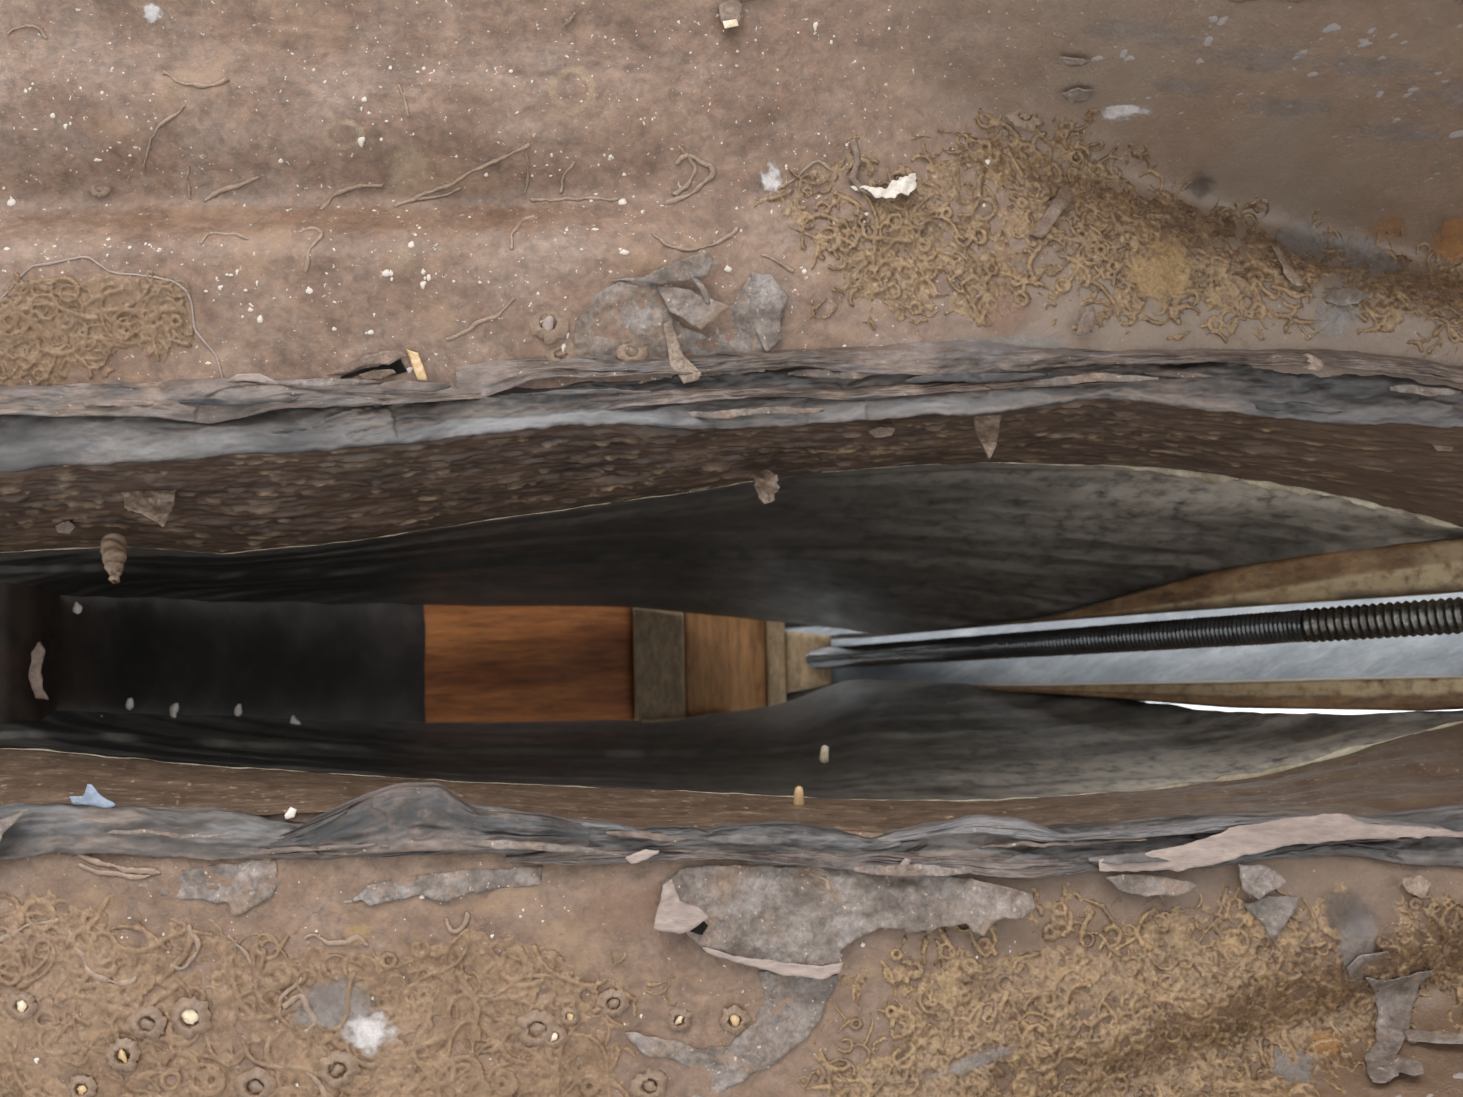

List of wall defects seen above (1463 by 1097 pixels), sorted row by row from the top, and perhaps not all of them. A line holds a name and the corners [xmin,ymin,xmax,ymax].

peeling [573,252,789,384]
peeling [625,857,1035,1097]
peeling [1347,951,1463,1083]